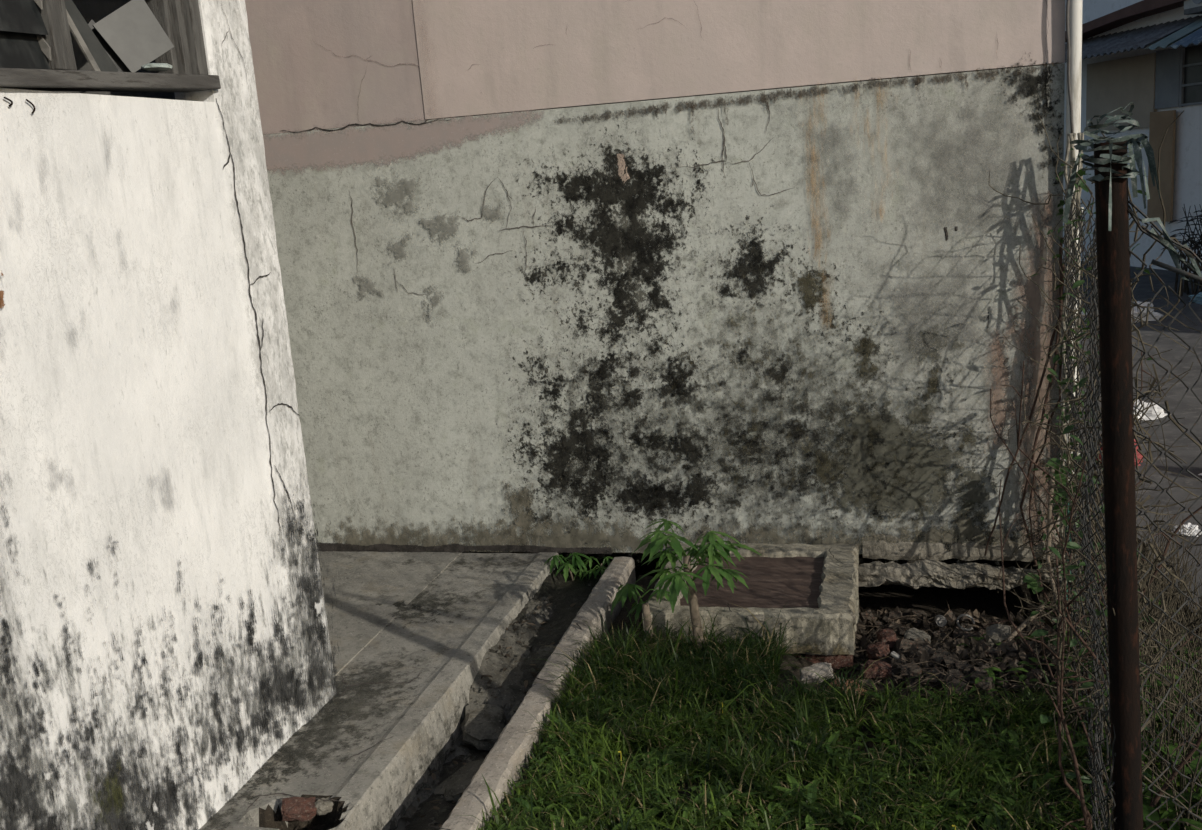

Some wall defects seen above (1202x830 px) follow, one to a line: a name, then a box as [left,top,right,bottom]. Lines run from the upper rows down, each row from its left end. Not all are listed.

crack [216,99,299,526]
crack [349,191,366,283]
crack [281,119,451,133]
leakage [326,58,1064,555]
leakage [0,490,339,830]
spalling [862,534,1059,562]